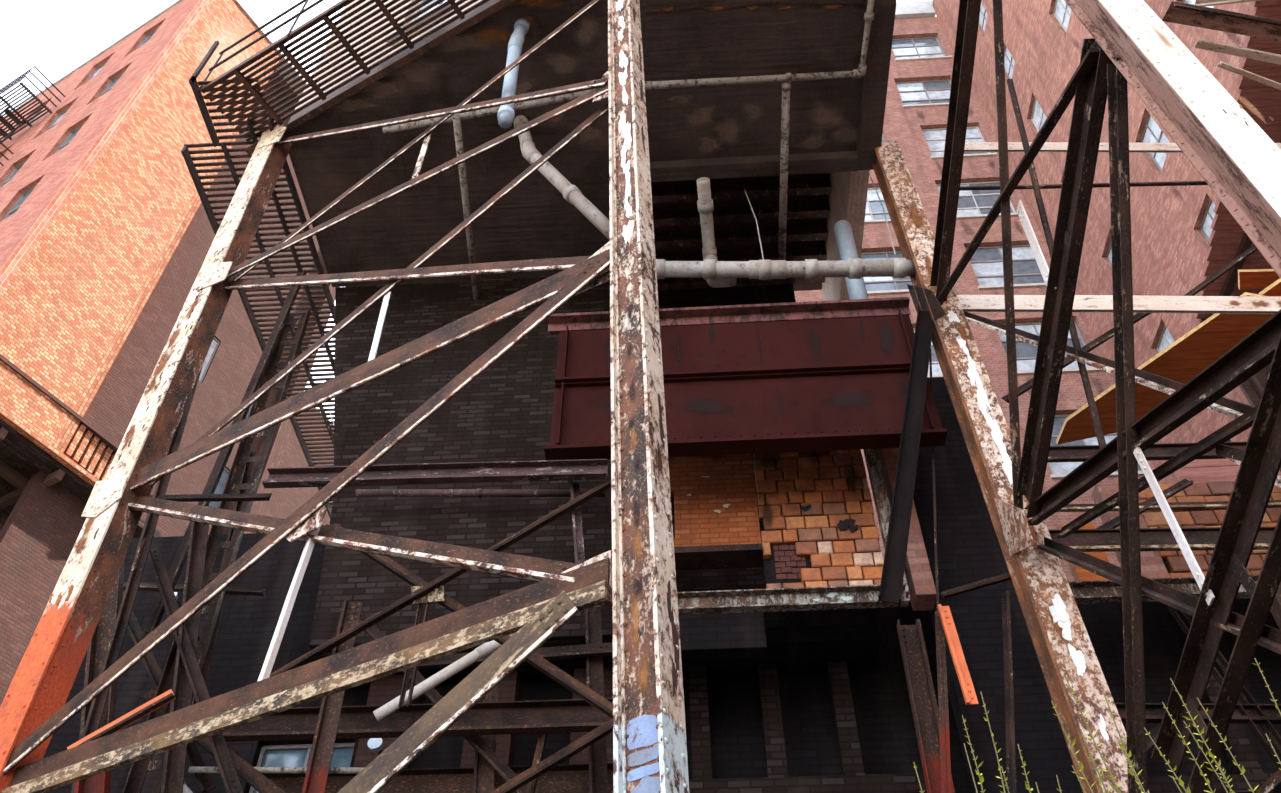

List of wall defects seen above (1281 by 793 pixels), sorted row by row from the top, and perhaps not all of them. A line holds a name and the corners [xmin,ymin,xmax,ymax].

corrosion [909,204,924,228]
peeling [946,310,960,324]
peeling [956,339,1013,485]
corrosion [628,419,639,468]
corrosion [633,503,642,557]
spalling [837,519,858,533]
corrosion [1025,515,1040,551]
peeling [49,570,85,610]
corrosion [633,579,643,639]
peeling [667,580,680,697]
peeling [1049,593,1086,677]
peeling [1097,714,1109,744]